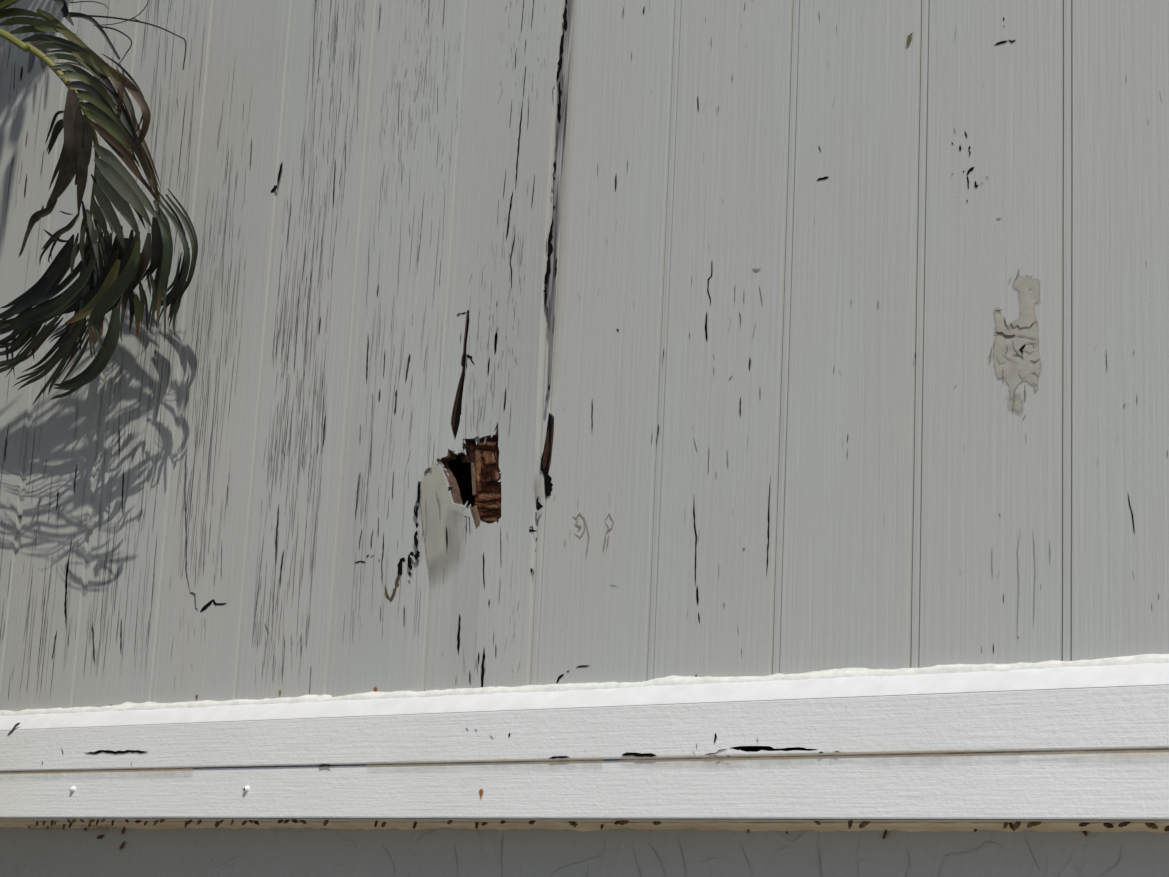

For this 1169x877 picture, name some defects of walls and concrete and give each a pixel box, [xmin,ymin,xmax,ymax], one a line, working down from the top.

crack [0,0,555,736]
peeling [990,270,1042,419]
peeling [437,425,498,491]
crack [42,748,146,765]